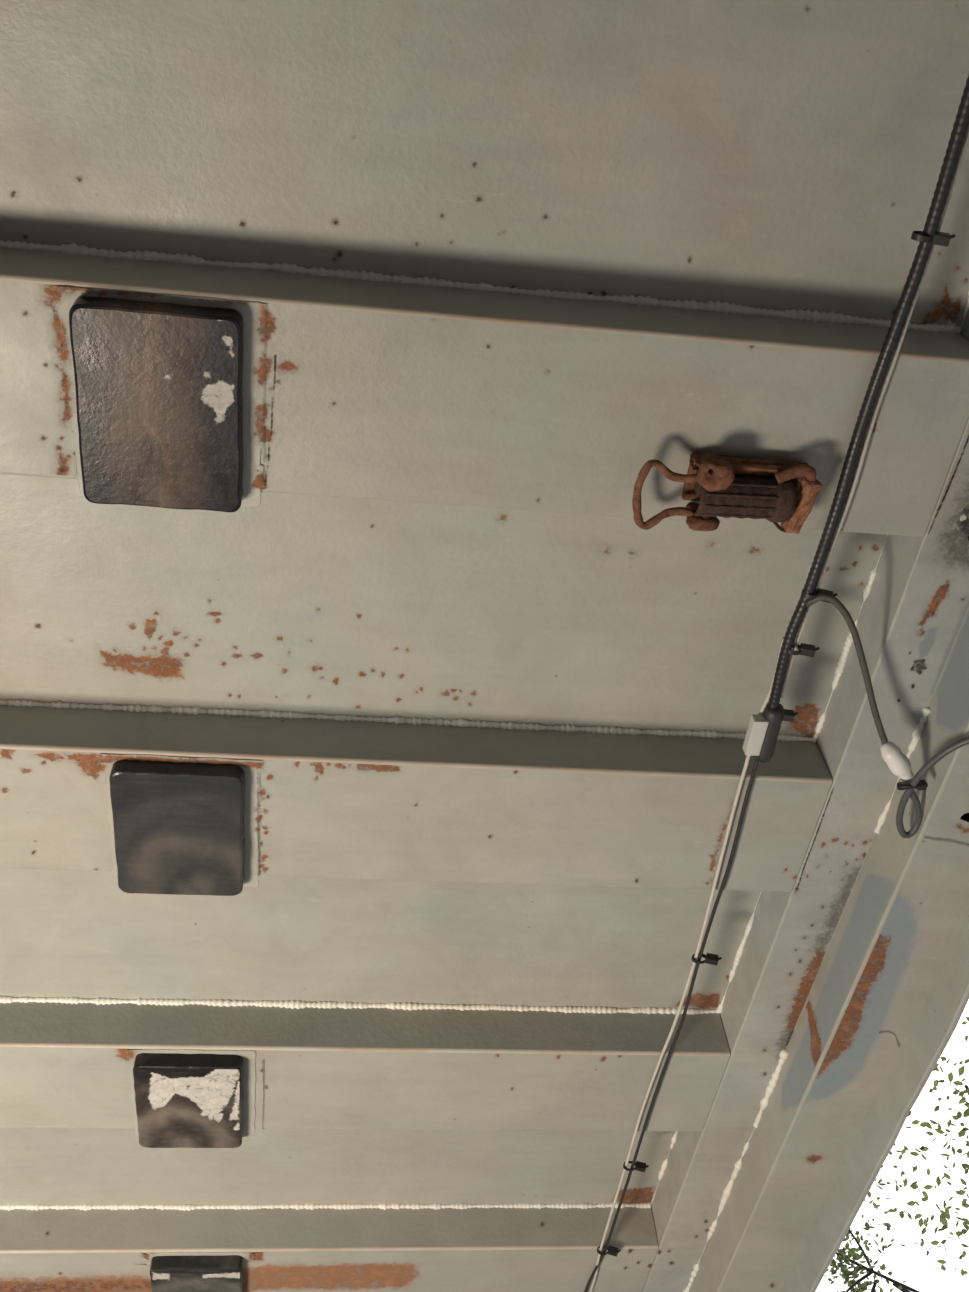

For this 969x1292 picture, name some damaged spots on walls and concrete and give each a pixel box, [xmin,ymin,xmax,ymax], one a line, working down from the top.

corrosion [912,247,969,327]
corrosion [23,283,304,490]
corrosion [65,596,227,686]
corrosion [217,633,481,710]
corrosion [911,576,964,639]
corrosion [781,695,826,738]
corrosion [0,749,405,876]
corrosion [667,973,730,1010]
corrosion [776,924,902,1081]
corrosion [606,1183,657,1204]
corrosion [0,1253,155,1292]